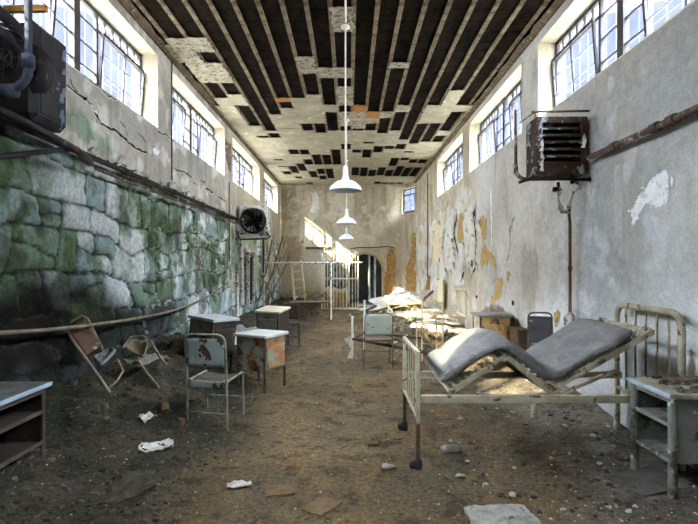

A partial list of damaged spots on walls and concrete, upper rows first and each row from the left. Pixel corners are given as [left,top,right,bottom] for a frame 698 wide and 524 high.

crack [66,75,176,166]
crack [173,168,227,202]
peeling [628,170,674,225]
spalling [384,229,417,296]
peeling [425,203,496,290]
spalling [488,271,511,308]